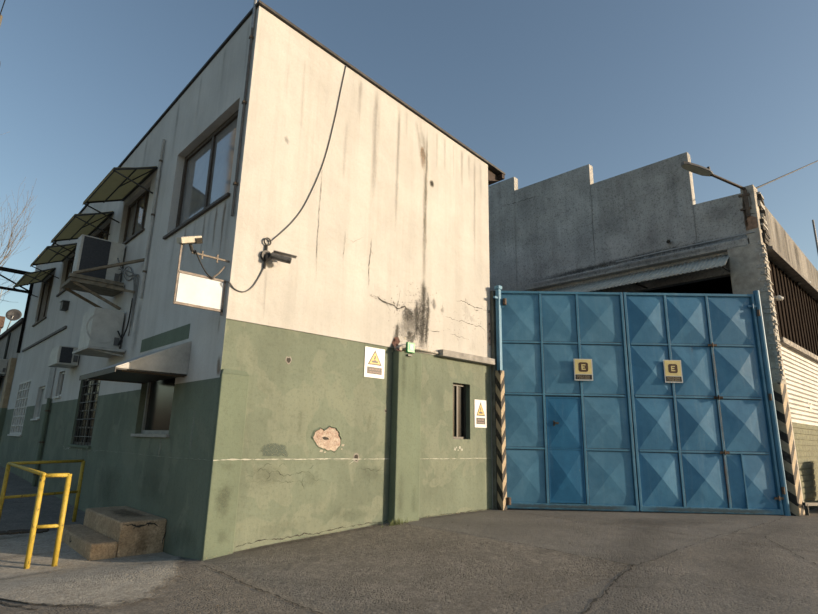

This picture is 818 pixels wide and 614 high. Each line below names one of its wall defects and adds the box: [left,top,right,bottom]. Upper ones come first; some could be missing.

water stain [371,286,437,347]
spalling [311,425,344,453]
crack [127,522,166,544]
crack [236,509,816,614]
crack [204,565,323,614]